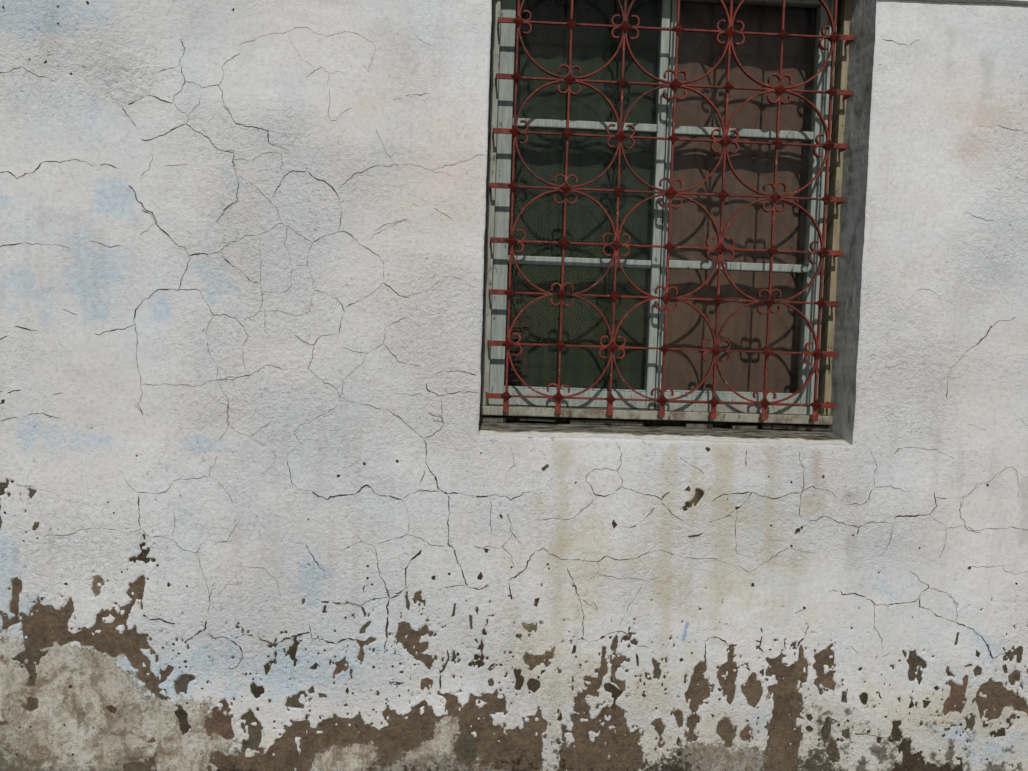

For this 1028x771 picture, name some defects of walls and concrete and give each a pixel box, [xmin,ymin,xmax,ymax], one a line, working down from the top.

crack [0,159,116,179]
crack [57,27,1027,669]
peeling [0,479,36,529]
peeling [680,481,709,511]
peeling [0,534,1028,771]
leakage [362,741,573,771]
leakage [606,746,702,771]
leakage [793,722,854,771]